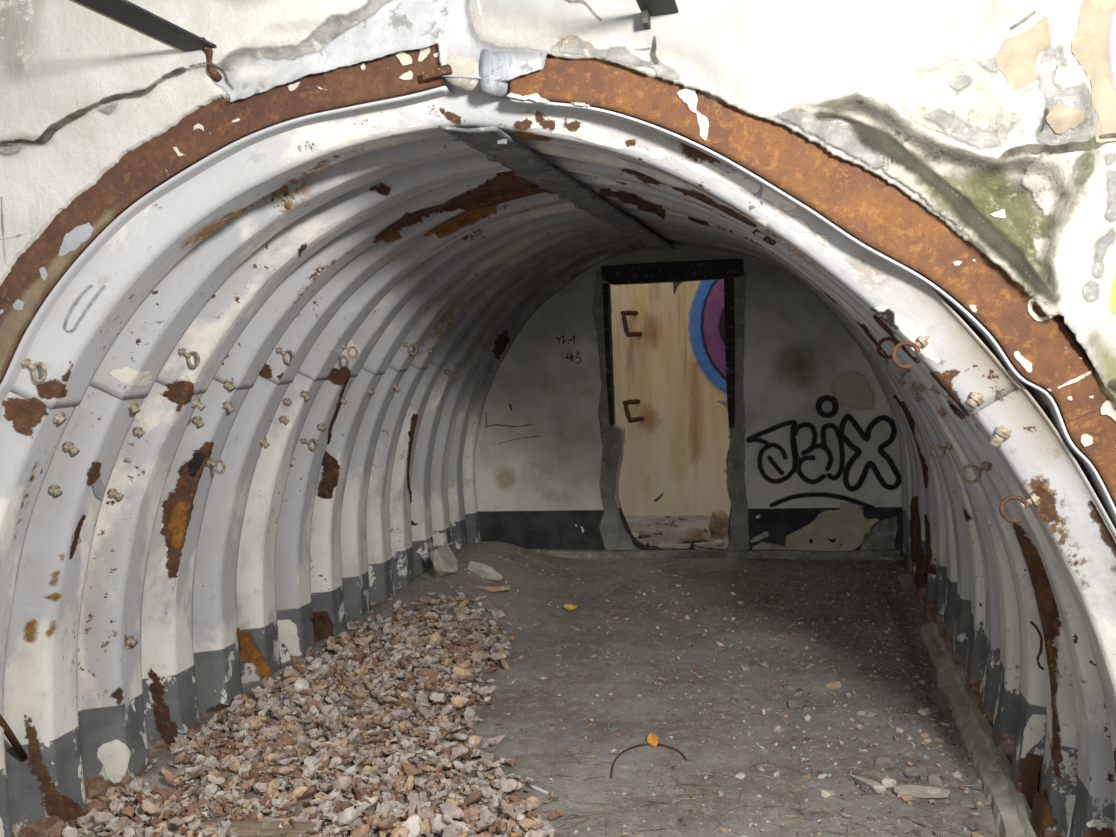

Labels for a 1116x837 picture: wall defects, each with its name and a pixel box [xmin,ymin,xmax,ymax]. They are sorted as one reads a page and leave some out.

crack [0,62,233,154]
rust [373,160,563,243]
peeling [522,102,829,246]
spalling [776,0,1116,315]
peeling [0,209,116,376]
rust [2,361,73,436]
peeling [109,367,152,386]
peeling [179,375,201,384]
rust [317,366,351,499]
rust [159,441,214,578]
rust [1023,476,1089,585]
rust [1013,523,1063,837]